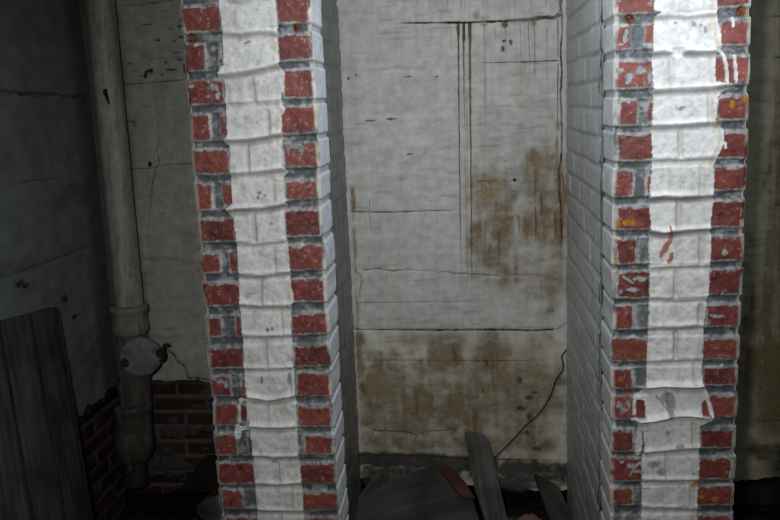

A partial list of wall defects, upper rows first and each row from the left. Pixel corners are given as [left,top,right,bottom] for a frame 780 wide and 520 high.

rust [457,23,472,254]
crack [409,0,564,234]
peeling [617,66,653,84]
water stain [468,149,567,283]
peeling [619,276,646,294]
peeling [659,226,674,263]
flaking render [134,379,229,494]
water stain [356,333,567,491]
peeling [620,461,665,476]
peeling [656,392,675,418]